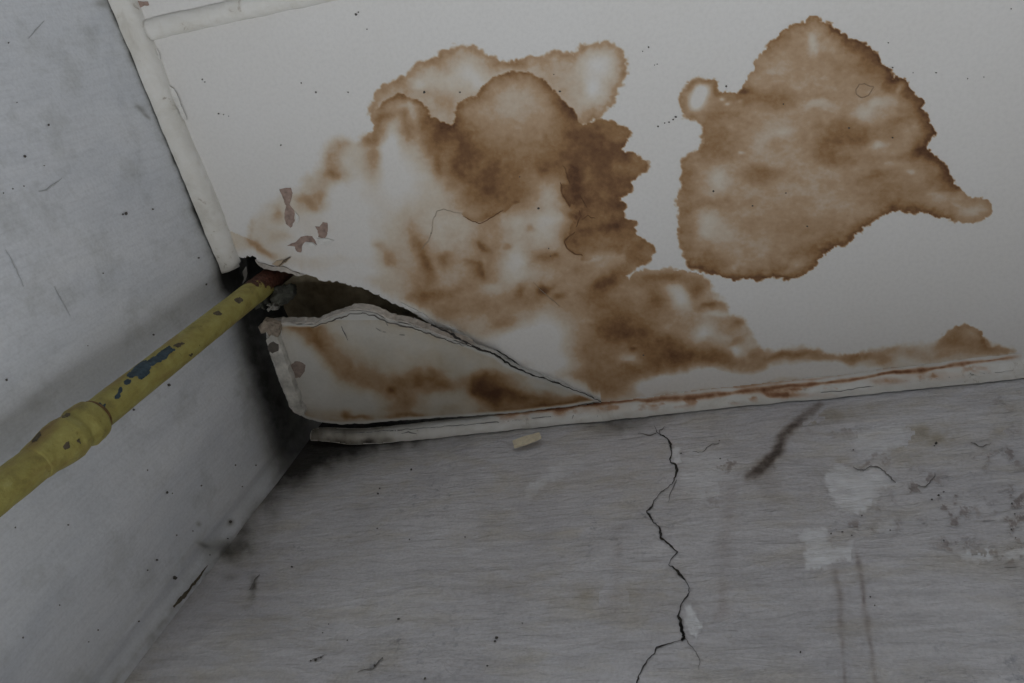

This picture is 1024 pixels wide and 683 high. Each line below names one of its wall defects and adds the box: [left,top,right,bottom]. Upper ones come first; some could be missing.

peeling [279,188,299,228]
leakage [85,0,1018,402]
peeling [291,361,306,378]
rust [487,354,1021,426]
leakage [796,378,1024,482]
leakage [80,304,813,683]
crack [636,426,719,683]